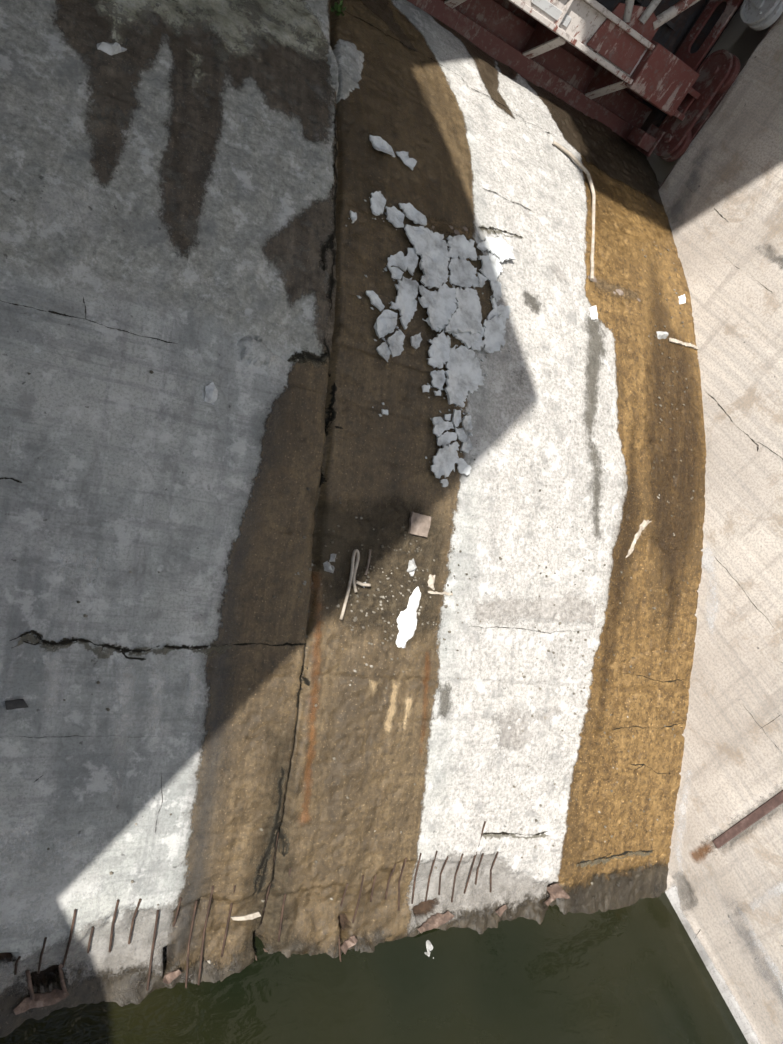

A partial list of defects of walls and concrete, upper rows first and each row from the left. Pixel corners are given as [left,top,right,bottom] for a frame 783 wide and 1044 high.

peeling [369,135,417,171]
water stain [430,14,681,217]
crack [2,297,177,344]
water stain [0,0,494,1038]
crack [287,110,343,488]
peeling [356,191,515,487]
water stain [584,316,606,536]
crack [10,630,310,732]
spalling [0,897,182,999]
crack [253,767,289,897]
spalling [338,821,550,962]
water stain [436,854,760,1044]